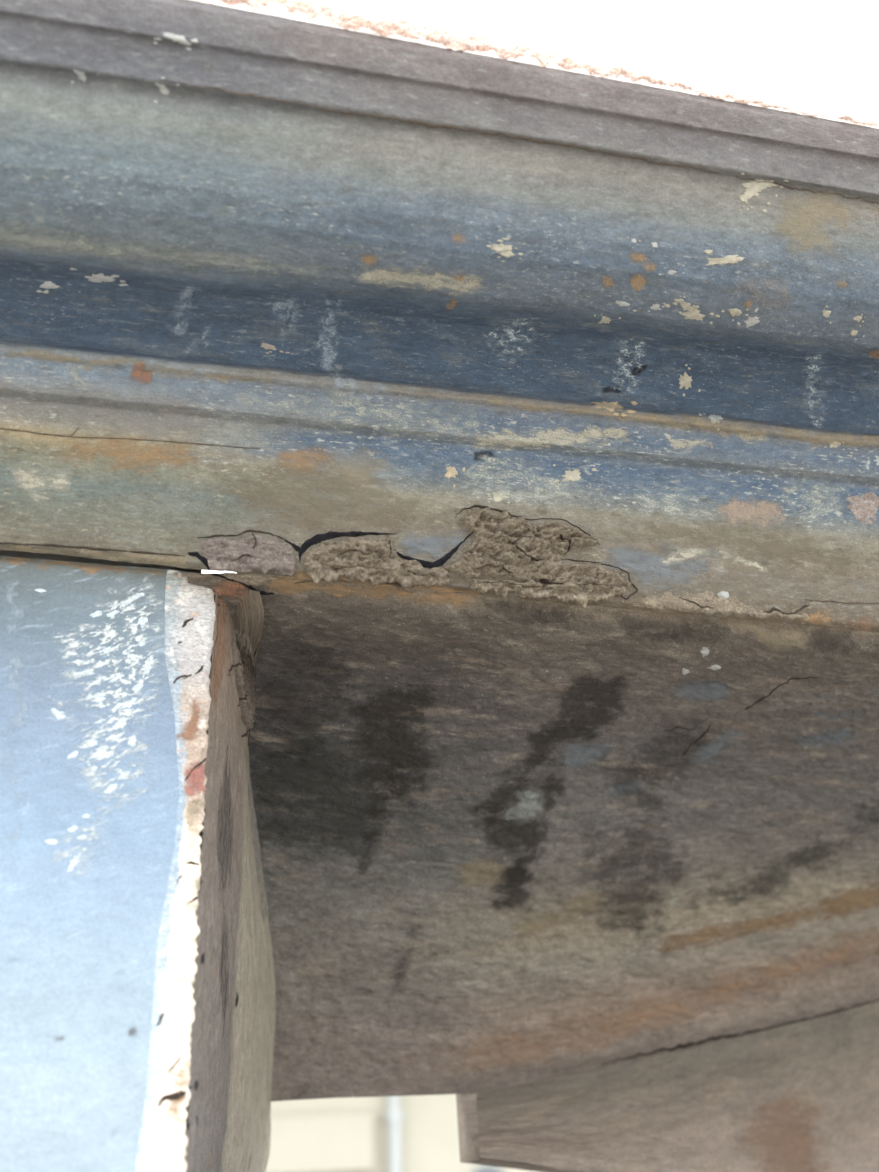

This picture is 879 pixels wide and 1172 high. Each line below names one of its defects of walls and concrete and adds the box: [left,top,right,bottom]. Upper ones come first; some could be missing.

peeling [739,173,789,213]
peeling [486,238,523,262]
peeling [703,250,744,266]
peeling [594,296,760,328]
peeling [679,364,700,396]
flaking render [201,383,638,608]
crack [745,676,818,711]
damp [353,691,432,801]
crack [664,725,711,756]
damp [476,677,624,909]
spalling [56,570,216,1172]
crack [602,999,879,1065]